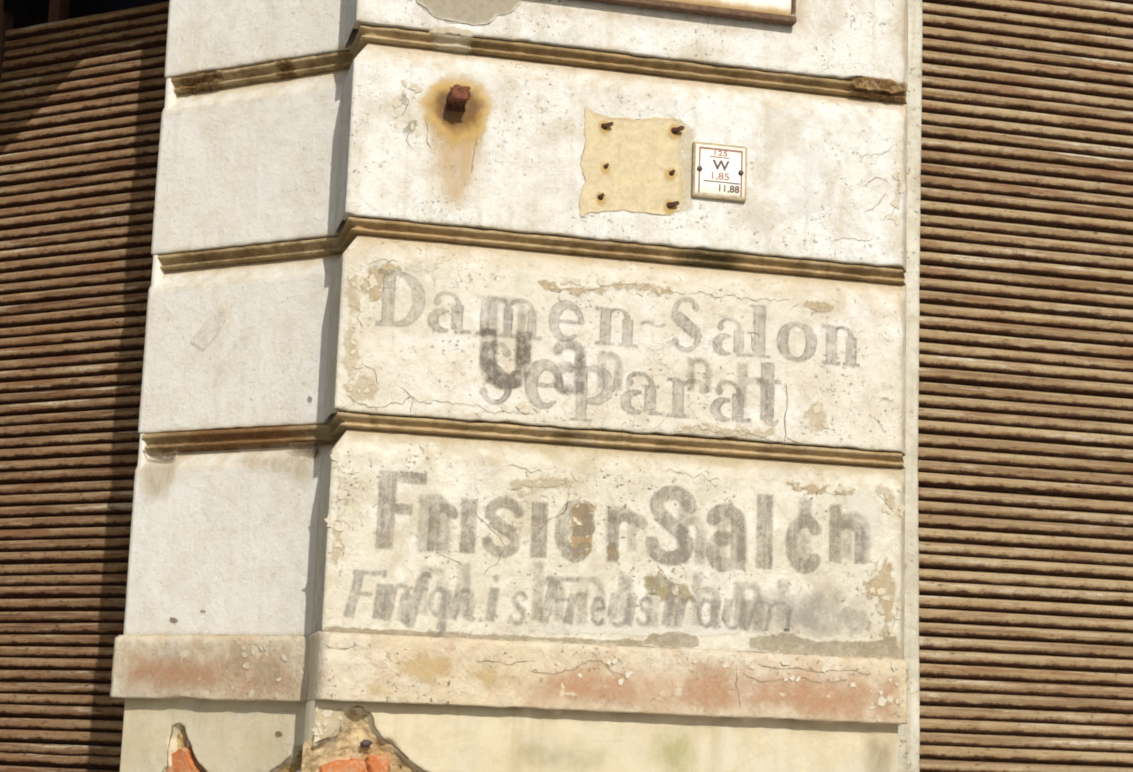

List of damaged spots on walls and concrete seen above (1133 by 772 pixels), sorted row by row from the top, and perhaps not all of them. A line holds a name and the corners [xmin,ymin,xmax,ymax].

corrosion [421,80,491,200]
peeling [862,557,900,643]
peeling [475,656,633,700]
peeling [697,657,900,722]
flaking render [162,723,206,772]
flaking render [275,705,426,772]